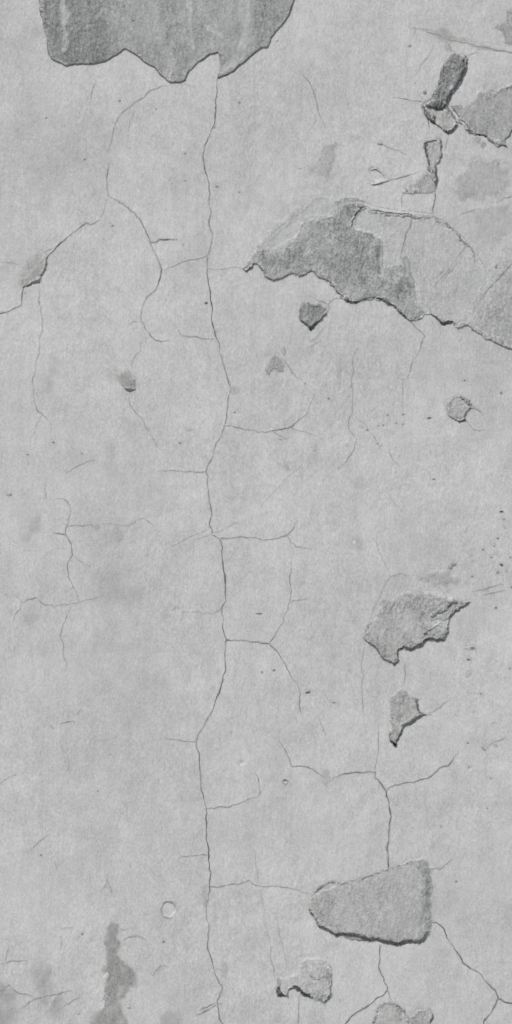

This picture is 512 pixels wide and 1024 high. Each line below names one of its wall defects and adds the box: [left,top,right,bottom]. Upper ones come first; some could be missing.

flaking render [38,0,298,86]
flaking render [401,51,512,209]
flaking render [240,137,512,357]
crack [363,171,512,269]
crack [13,460,154,688]
crack [45,78,331,1024]
flaking render [362,560,474,668]
crack [275,646,459,869]
flaking render [387,686,432,748]
flaking render [307,855,438,947]
crack [345,945,391,1024]
crack [433,921,512,1024]